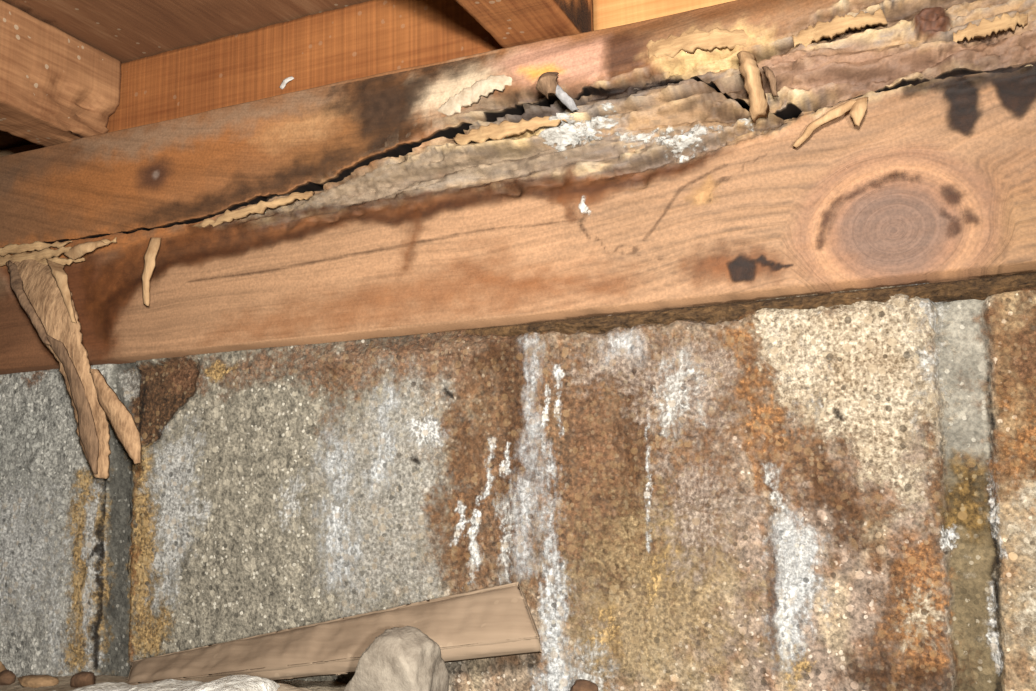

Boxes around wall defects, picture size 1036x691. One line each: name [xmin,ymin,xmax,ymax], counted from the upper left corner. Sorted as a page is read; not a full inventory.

water stain [334,70,430,148]
peeling [536,72,579,112]
crack [579,196,591,225]
water stain [540,286,991,549]
water stain [450,437,510,582]
water stain [496,502,514,579]
water stain [533,498,570,691]
water stain [644,451,822,691]